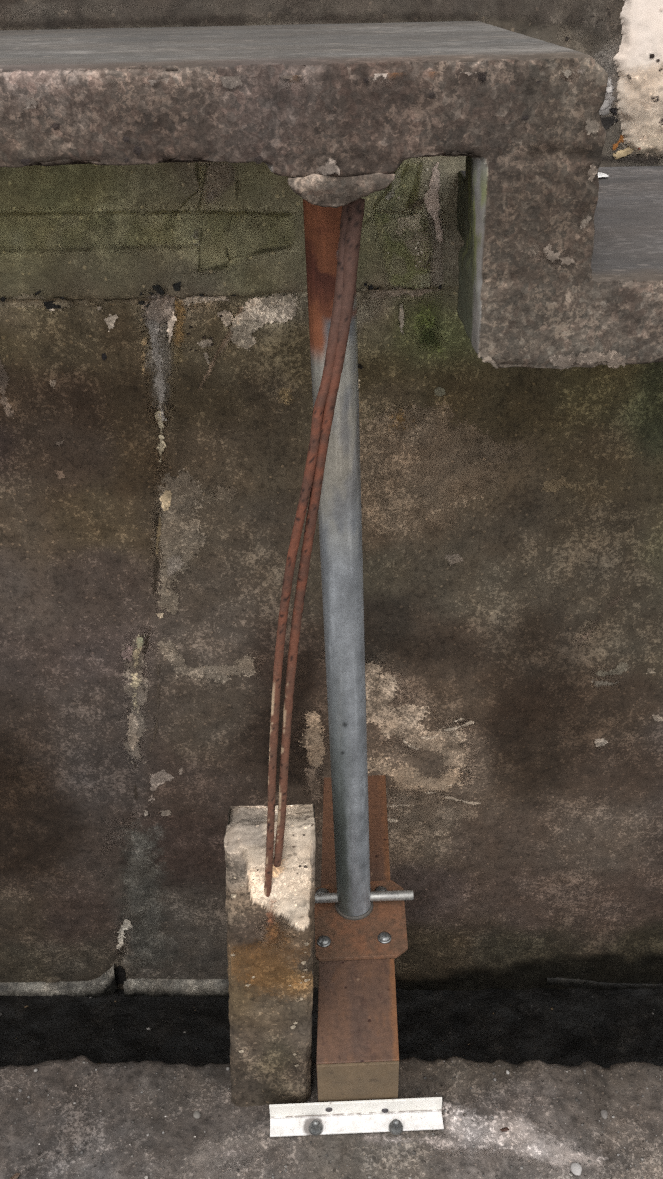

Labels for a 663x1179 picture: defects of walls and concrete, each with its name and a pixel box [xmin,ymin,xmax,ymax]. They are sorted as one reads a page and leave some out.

damp [0,0,625,34]
damp [316,158,340,175]
spalling [0,282,300,363]
spalling [253,162,443,897]